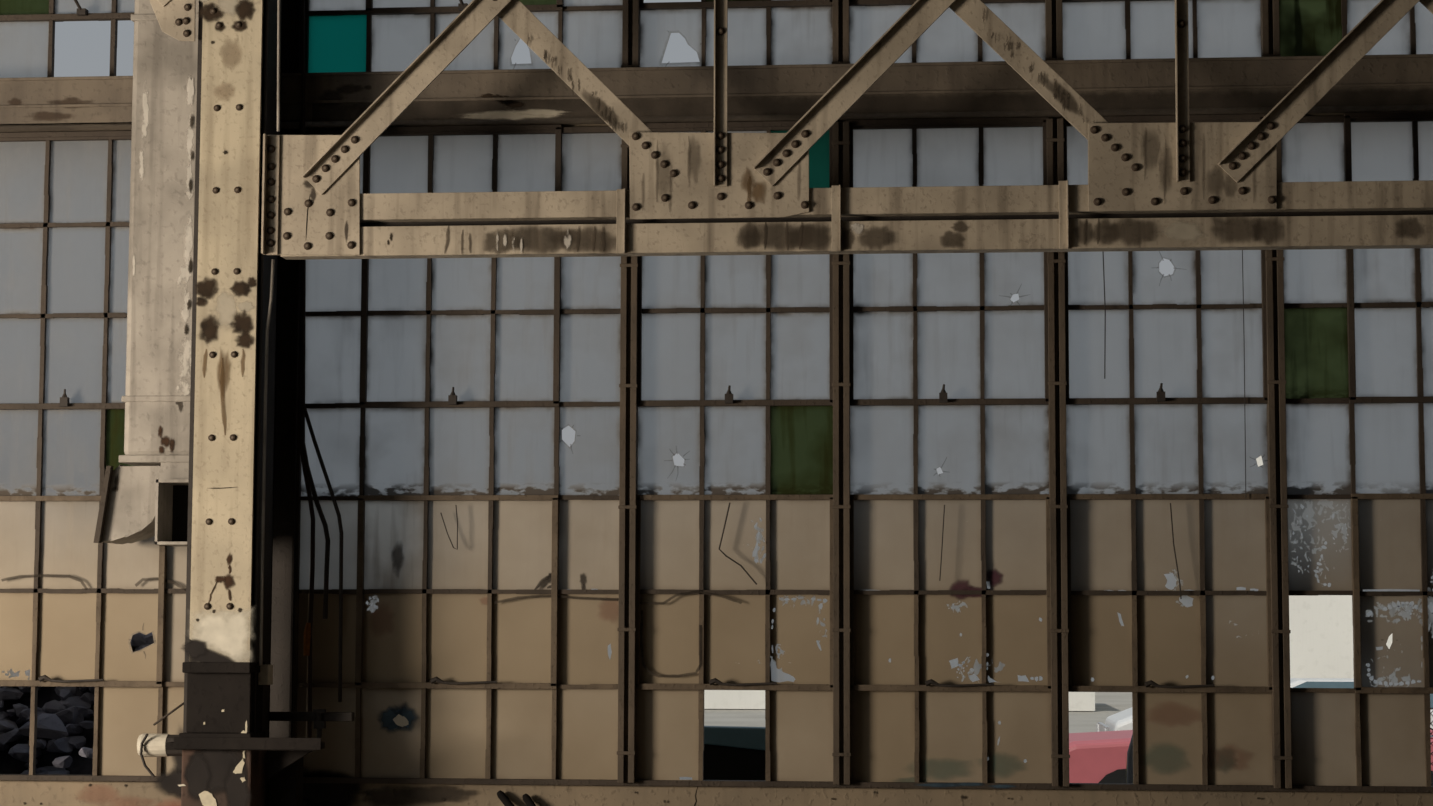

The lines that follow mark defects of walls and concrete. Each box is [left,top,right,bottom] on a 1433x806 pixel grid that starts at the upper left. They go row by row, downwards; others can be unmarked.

leakage [739,221,893,250]
rust [208,554,235,603]
peeling [193,608,250,662]